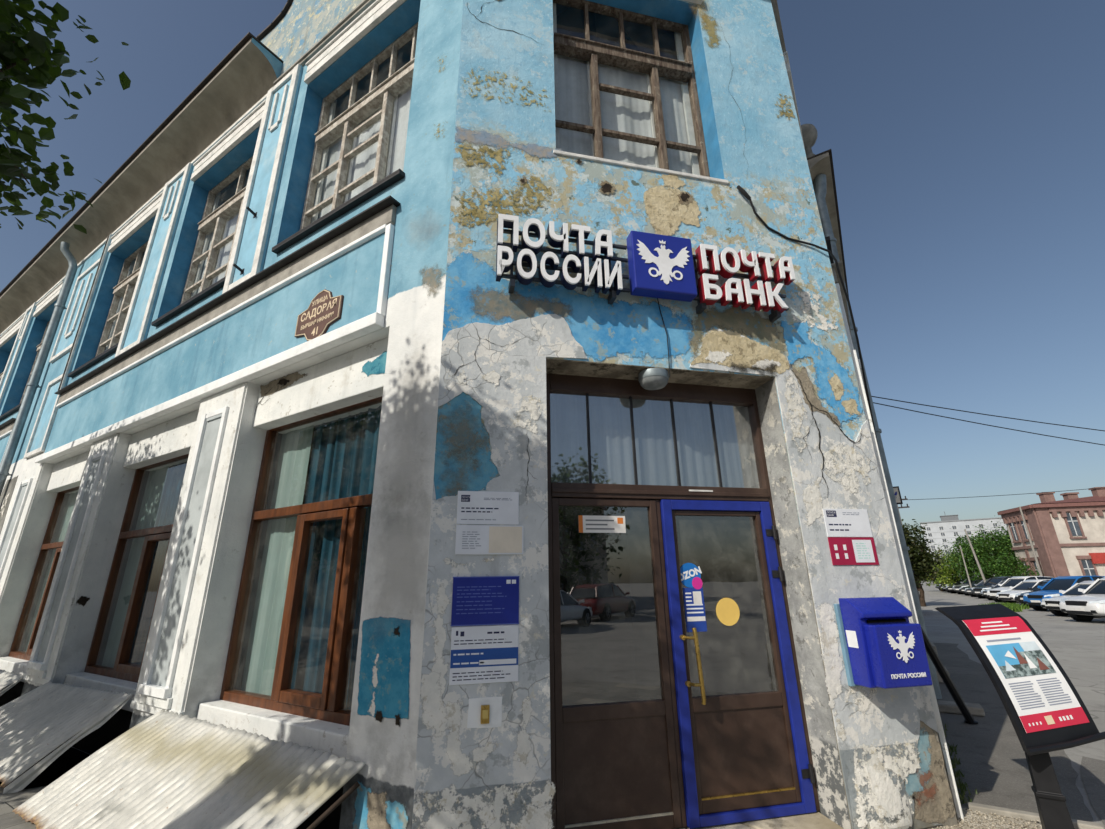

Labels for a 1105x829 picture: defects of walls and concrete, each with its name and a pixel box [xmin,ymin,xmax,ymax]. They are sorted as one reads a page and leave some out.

peeling [463,69,549,106]
corrosion [697,1,720,48]
peeling [643,174,701,236]
peeling [442,252,868,453]
peeling [434,372,500,500]
crack [789,365,862,498]
peeling [803,444,871,525]
peeling [352,583,557,829]
peeling [819,603,877,742]
peeling [852,721,958,829]